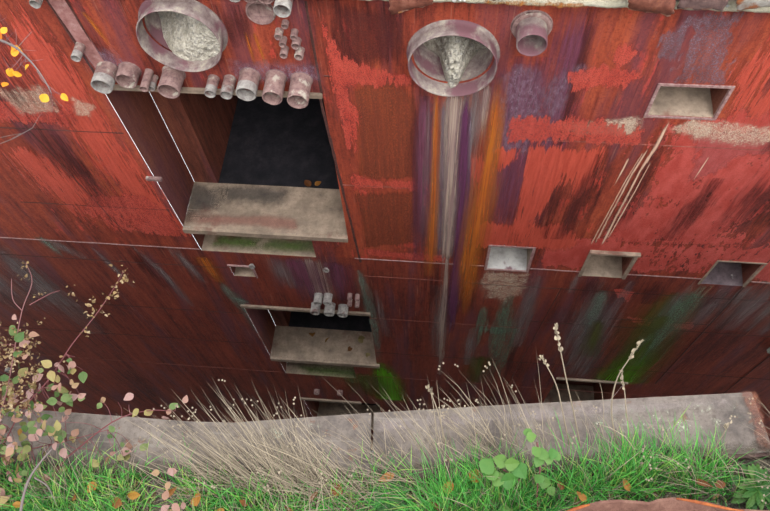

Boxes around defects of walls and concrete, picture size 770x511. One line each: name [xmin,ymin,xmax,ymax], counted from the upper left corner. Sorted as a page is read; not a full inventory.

corrosion [216,5,264,59]
peeling [322,20,416,152]
peeling [350,174,418,197]
corrosion [354,83,416,179]
corrosion [357,98,439,261]
corrosion [460,101,502,306]
water stain [411,17,590,380]
peeling [469,12,770,285]
corrosion [565,497,770,511]